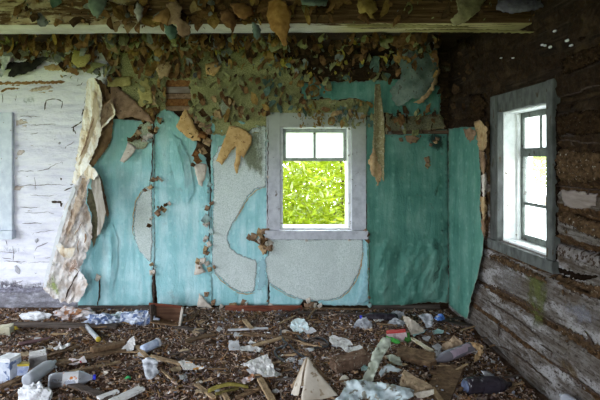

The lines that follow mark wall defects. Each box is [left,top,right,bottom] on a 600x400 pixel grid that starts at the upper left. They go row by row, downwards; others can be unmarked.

peeling [0,0,446,304]
peeling [474,118,490,239]